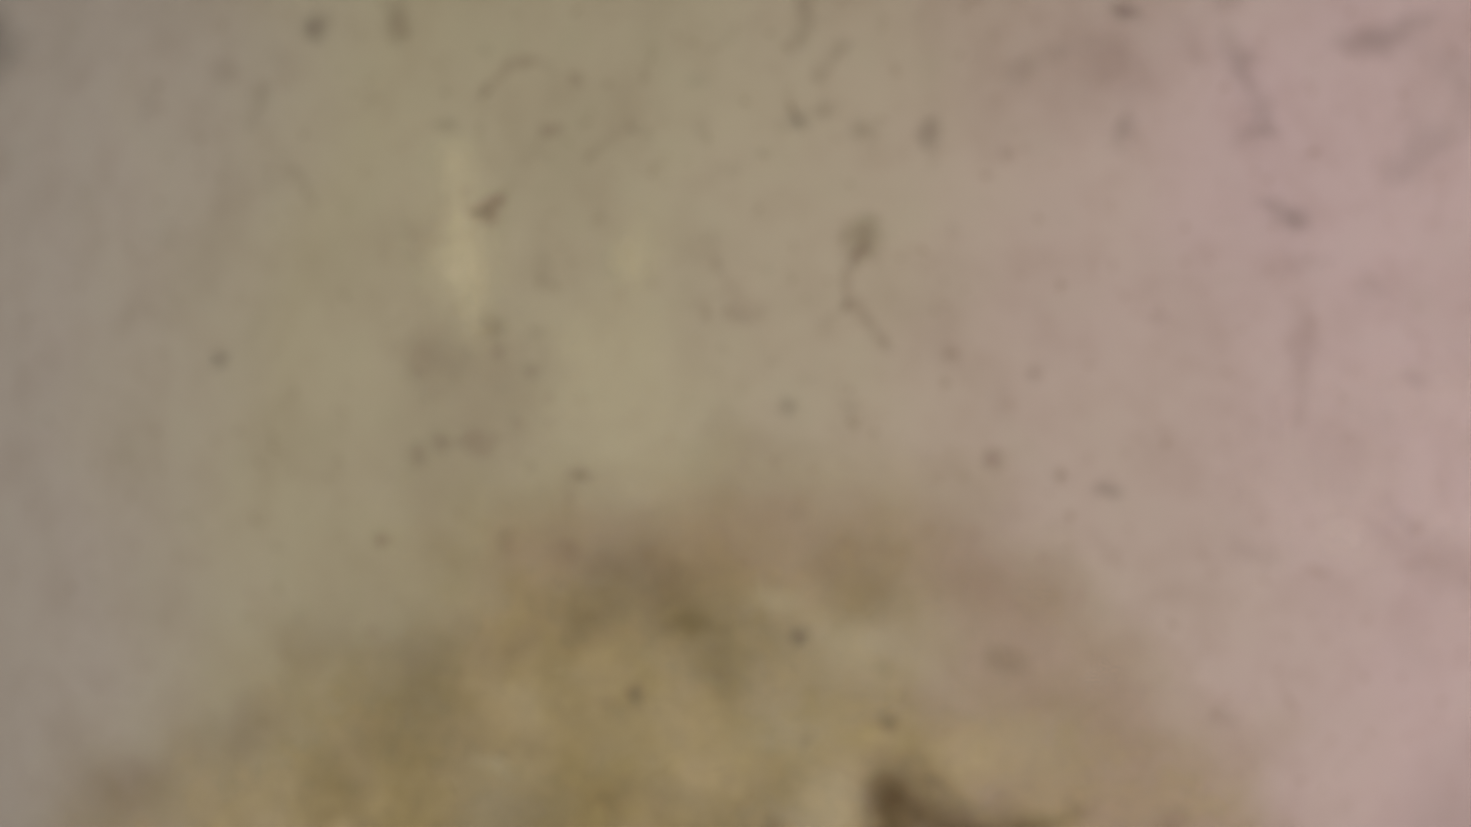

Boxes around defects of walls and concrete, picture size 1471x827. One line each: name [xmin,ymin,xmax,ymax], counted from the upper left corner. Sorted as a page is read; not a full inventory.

damp [190,530,1212,827]